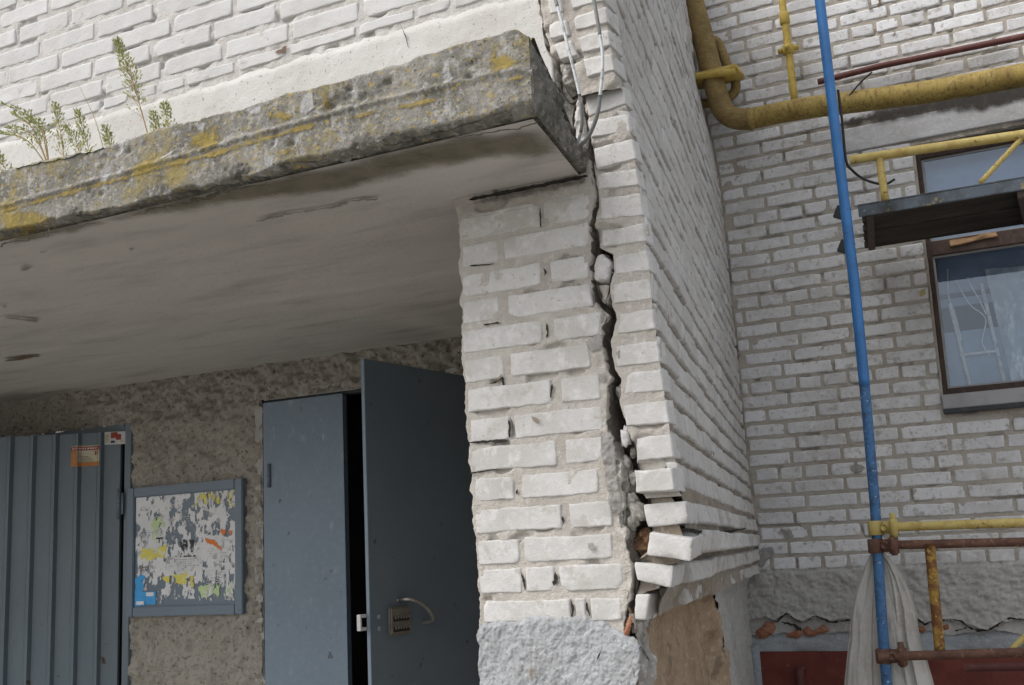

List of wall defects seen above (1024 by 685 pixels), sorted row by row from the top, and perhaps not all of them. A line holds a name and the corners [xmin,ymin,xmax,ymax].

water stain [300,93,314,113]
water stain [134,135,549,215]
crack [559,69,652,637]
spalling [624,588,732,685]
crack [770,613,850,631]
crack [917,617,1024,632]